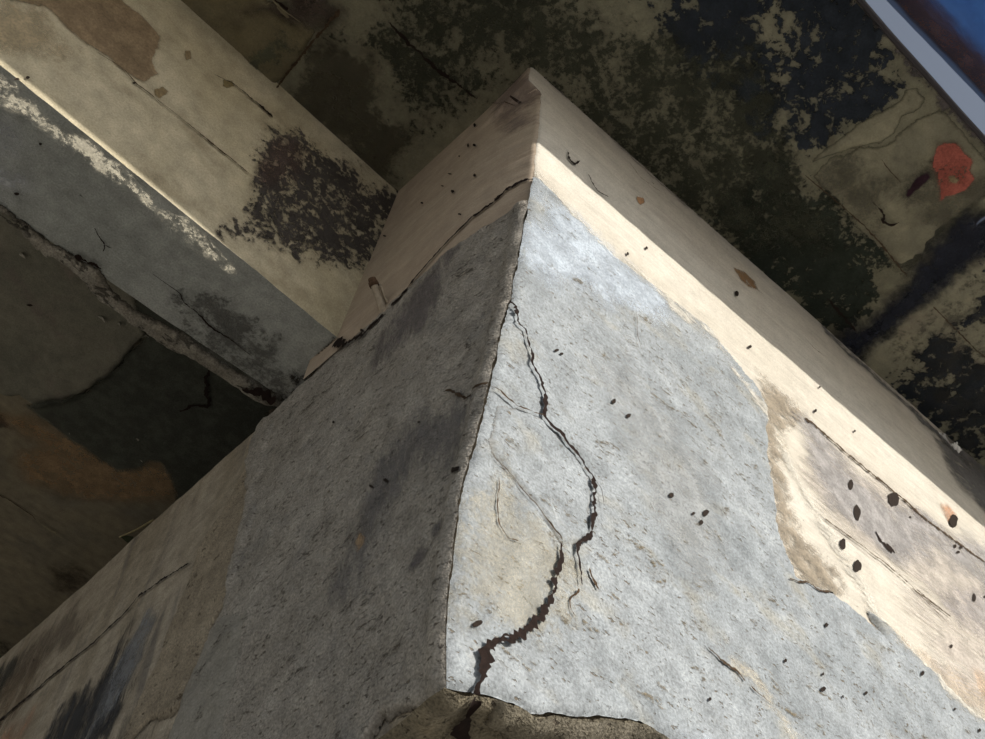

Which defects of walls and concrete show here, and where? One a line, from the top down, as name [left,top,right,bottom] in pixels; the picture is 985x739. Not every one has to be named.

crack [99,53,247,172]
crack [217,75,273,117]
rust [895,0,985,95]
leakage [215,0,985,365]
crack [75,229,110,269]
crack [153,274,253,357]
crack [242,387,276,405]
leakage [886,295,985,509]
crack [443,301,604,739]
peeling [760,373,845,594]
leakage [44,611,155,739]